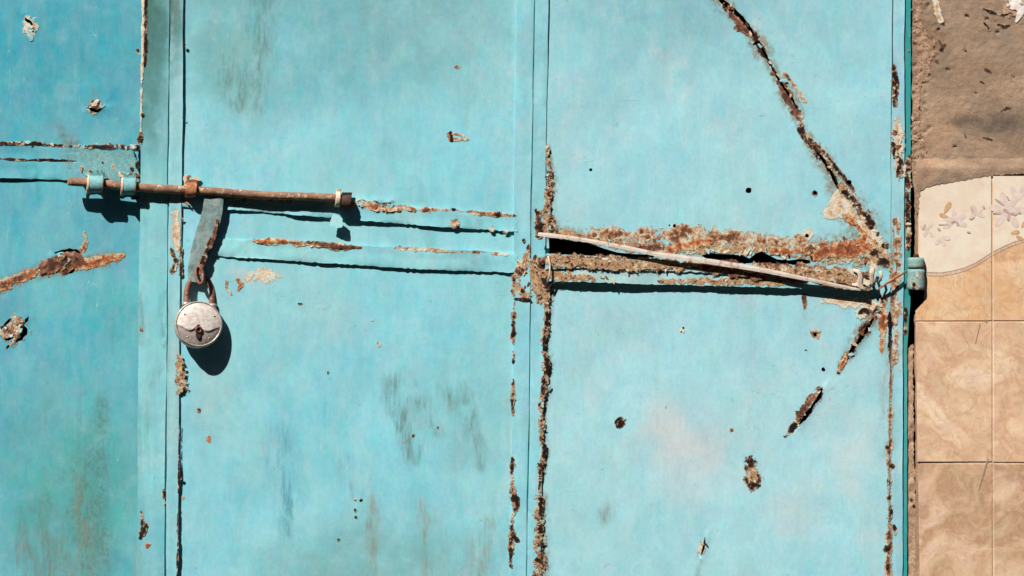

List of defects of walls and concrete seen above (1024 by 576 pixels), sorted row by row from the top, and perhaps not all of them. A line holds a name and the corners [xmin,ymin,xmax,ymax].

rust [904,155,912,250]